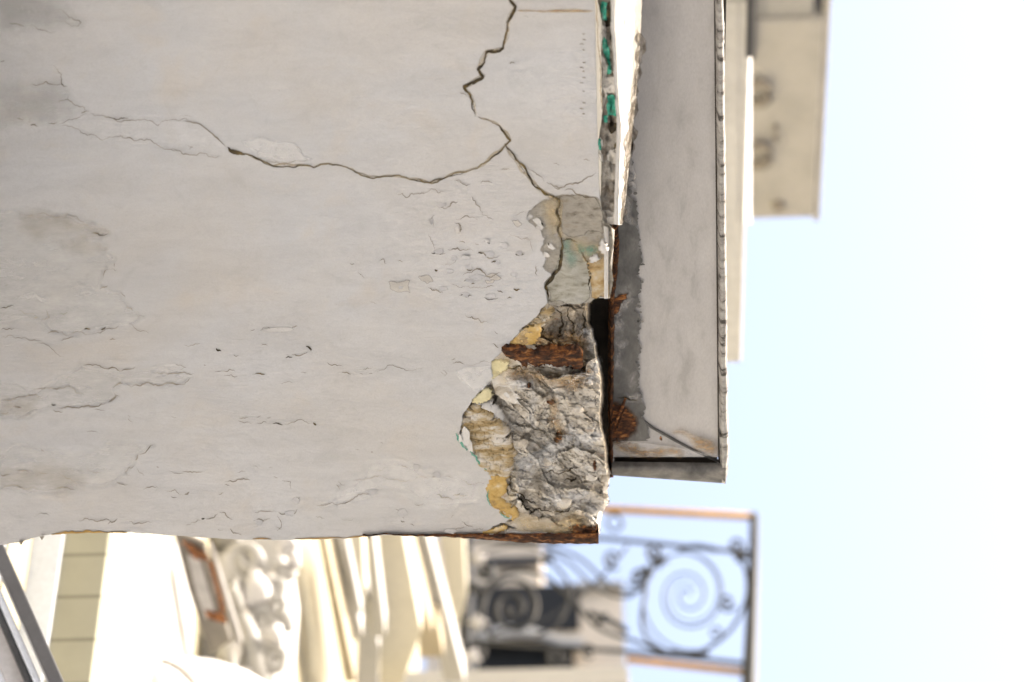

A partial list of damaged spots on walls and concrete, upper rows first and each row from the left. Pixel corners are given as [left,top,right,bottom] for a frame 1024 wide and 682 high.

crack [18,0,594,298]
spalling [316,0,650,535]
corrosion [608,224,679,478]
spalling [40,530,127,540]
corrosion [569,523,600,533]